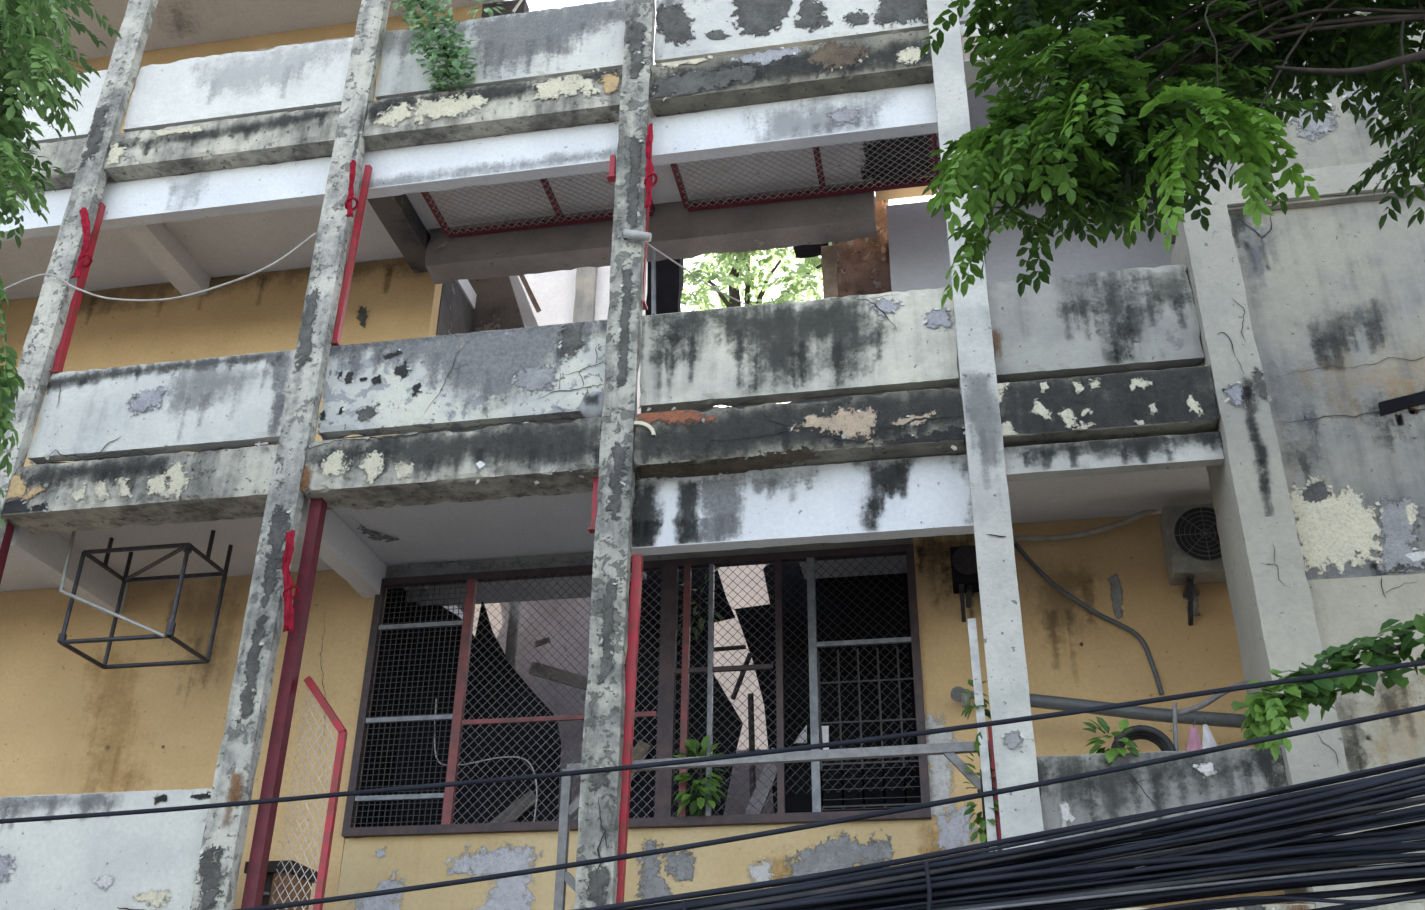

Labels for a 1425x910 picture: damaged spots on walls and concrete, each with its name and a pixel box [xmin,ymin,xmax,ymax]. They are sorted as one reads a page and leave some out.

damp [634,295,964,462]
peeling [1029,377,1101,431]
damp [1000,276,1223,467]
peeling [1129,378,1158,425]
peeling [71,461,193,501]
peeling [315,449,414,485]
damp [632,475,782,547]
spalling [534,406,966,521]
damp [853,458,912,530]
peeling [1289,475,1425,576]
peeling [438,842,543,910]
peeling [745,829,900,890]